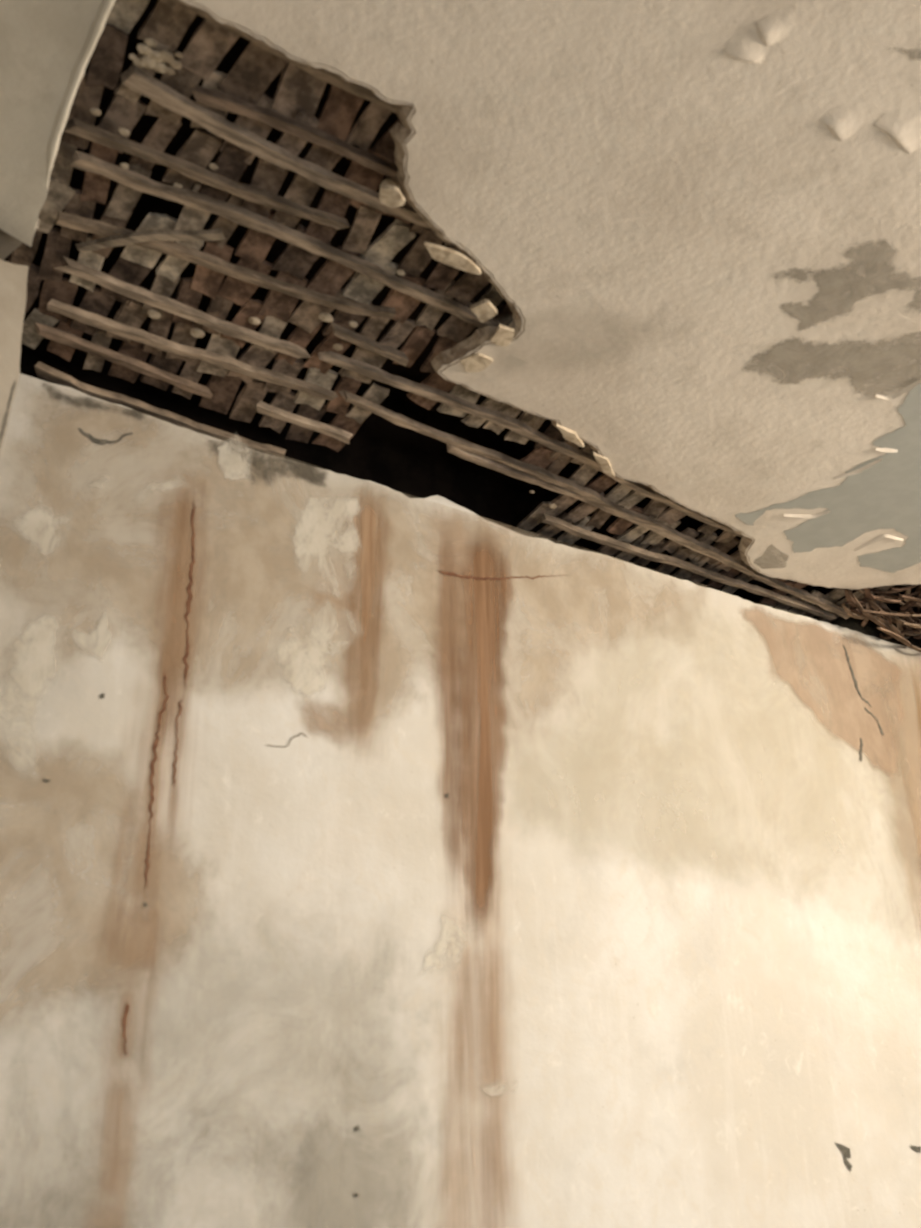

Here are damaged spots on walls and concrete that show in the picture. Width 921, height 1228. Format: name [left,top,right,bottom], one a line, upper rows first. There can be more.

crack [145,504,196,889]
leakage [0,389,411,733]
peeling [279,498,359,696]
peeling [379,185,405,208]
peeling [424,242,481,275]
peeling [461,299,514,372]
leakage [359,492,681,713]
peeling [556,423,615,478]
peeling [735,240,921,573]
leakage [744,609,921,864]
leakage [0,749,199,1019]
crack [121,1004,129,1054]